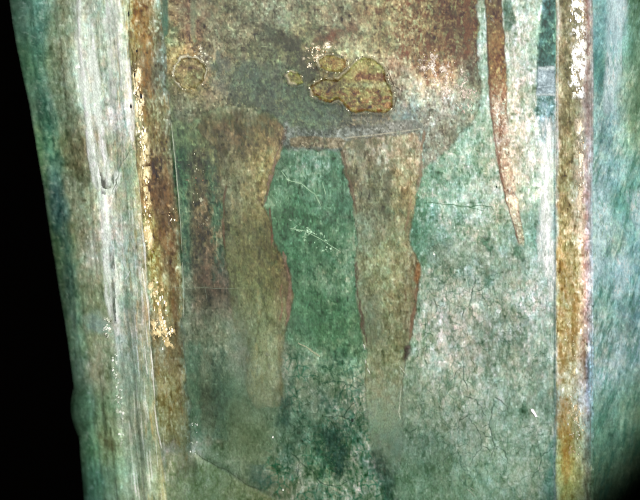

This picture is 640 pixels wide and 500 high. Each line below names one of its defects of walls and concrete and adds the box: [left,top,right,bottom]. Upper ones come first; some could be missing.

peeling [569,0,587,98]
peeling [133,62,153,250]
peeling [148,280,175,350]